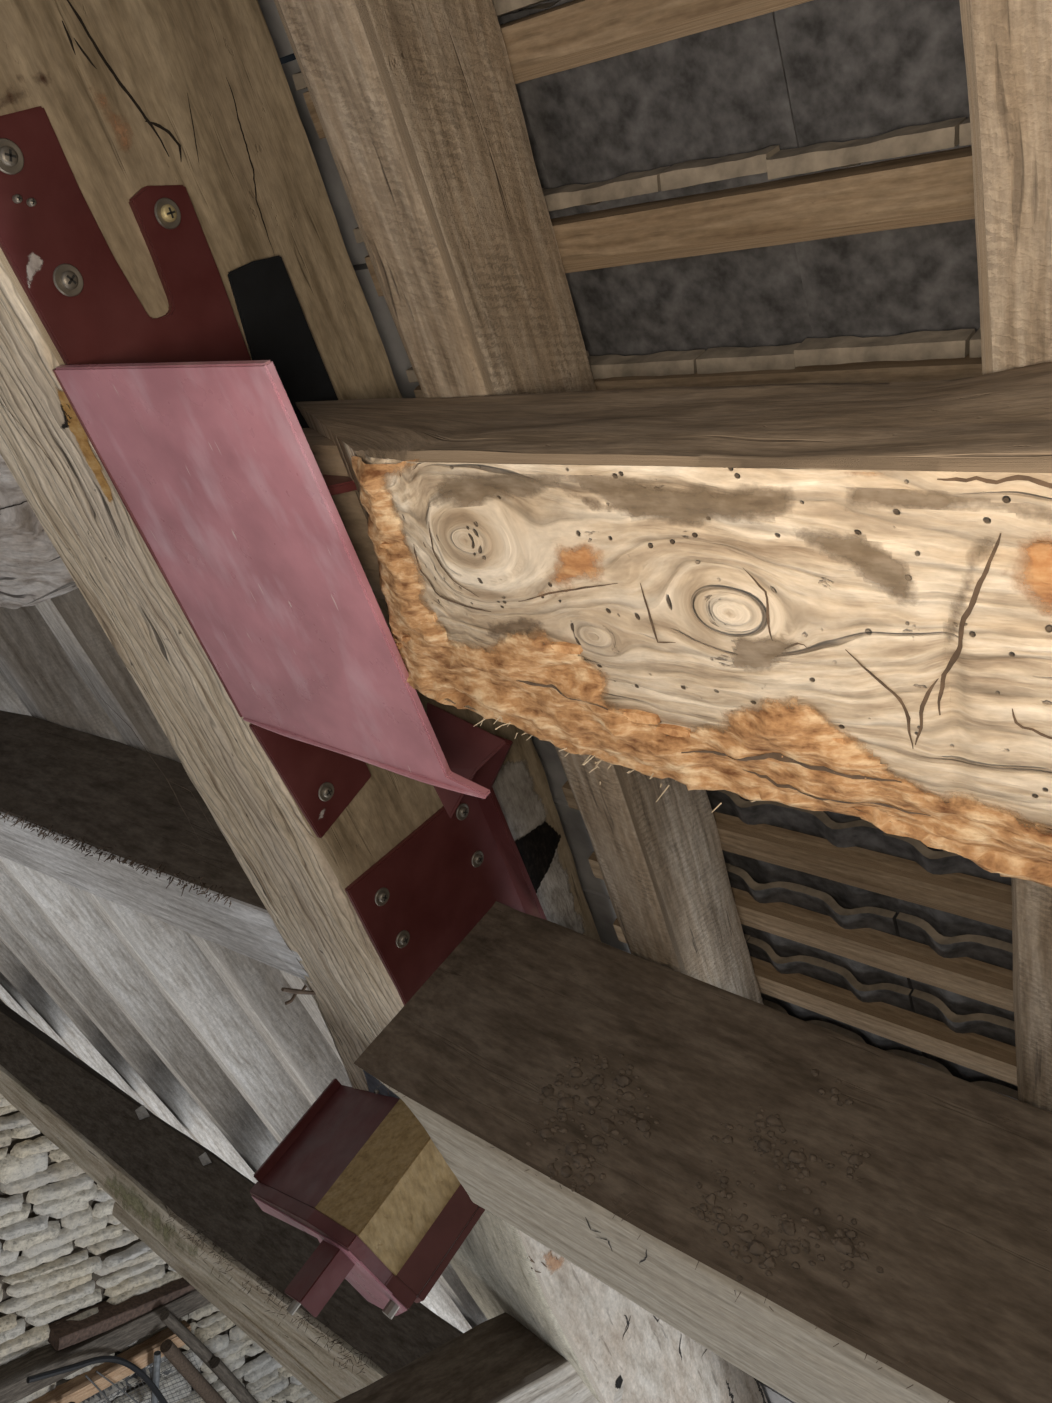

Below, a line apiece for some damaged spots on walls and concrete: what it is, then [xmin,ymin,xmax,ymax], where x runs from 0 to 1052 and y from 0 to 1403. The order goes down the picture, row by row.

crack [62,0,199,162]
crack [226,78,275,256]
crack [0,395,69,489]
crack [743,568,809,650]
crack [845,533,1001,748]
crack [516,680,608,710]
crack [1012,709,1052,739]
crack [681,750,931,816]